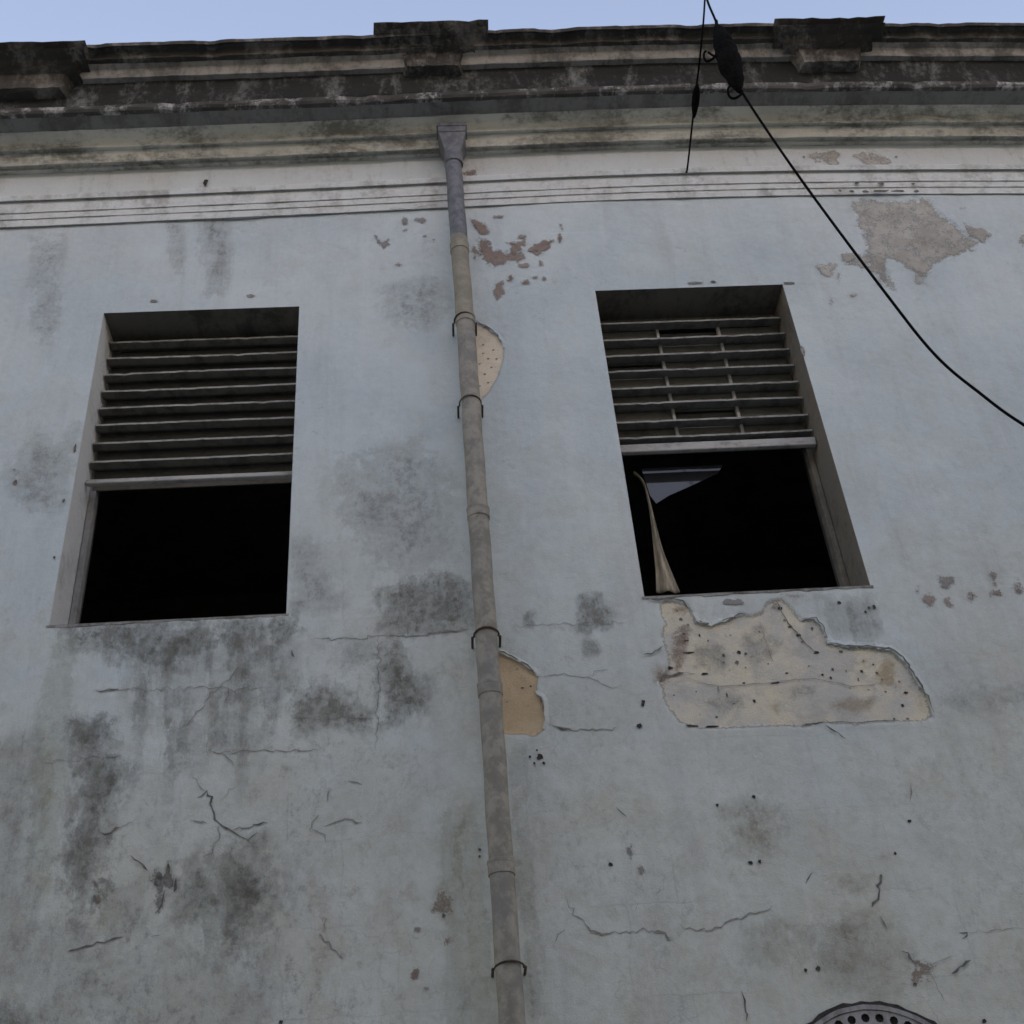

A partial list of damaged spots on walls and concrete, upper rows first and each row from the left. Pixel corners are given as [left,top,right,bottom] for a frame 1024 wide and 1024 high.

peeling [802,151,840,165]
peeling [472,215,563,300]
peeling [816,182,991,290]
flaking render [475,321,506,399]
peeling [917,576,955,608]
crack [98,662,269,728]
crack [290,628,467,742]
flaking render [498,648,550,736]
crack [552,724,616,732]
flaking render [645,594,938,739]
crack [191,748,315,856]
crack [555,898,771,943]